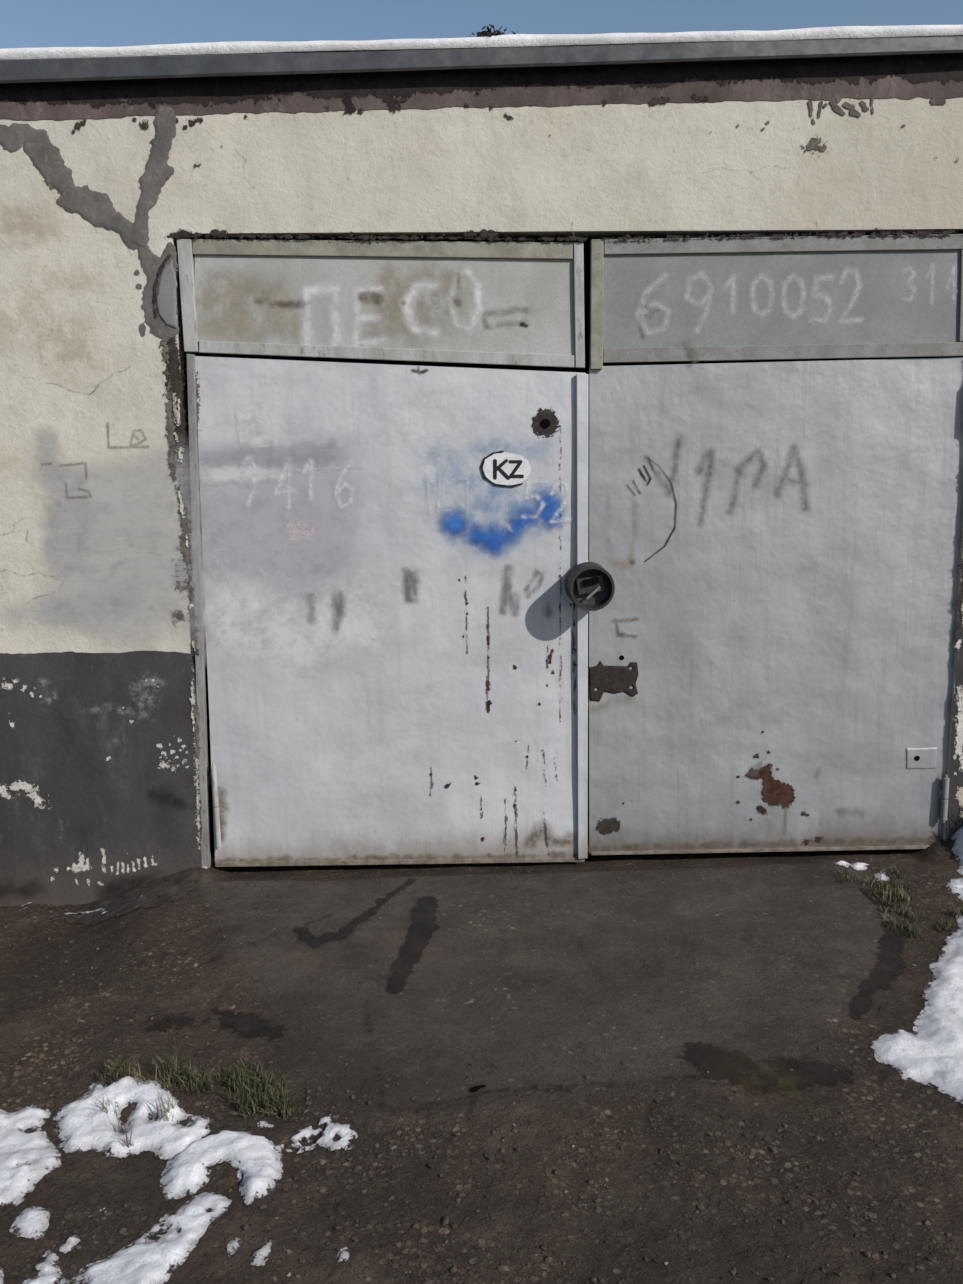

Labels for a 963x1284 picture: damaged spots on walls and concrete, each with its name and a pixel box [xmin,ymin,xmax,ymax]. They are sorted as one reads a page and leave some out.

spalling [801,96,874,157]
crack [0,105,179,339]
spalling [167,228,963,243]
spalling [156,335,203,850]
corrosion [546,567,577,722]
peeling [952,670,963,818]
peeling [0,777,50,809]
peeling [50,848,157,886]
corrosion [481,785,525,858]
corrosion [543,803,660,858]
corrosion [736,750,809,826]
corrosion [744,836,864,847]